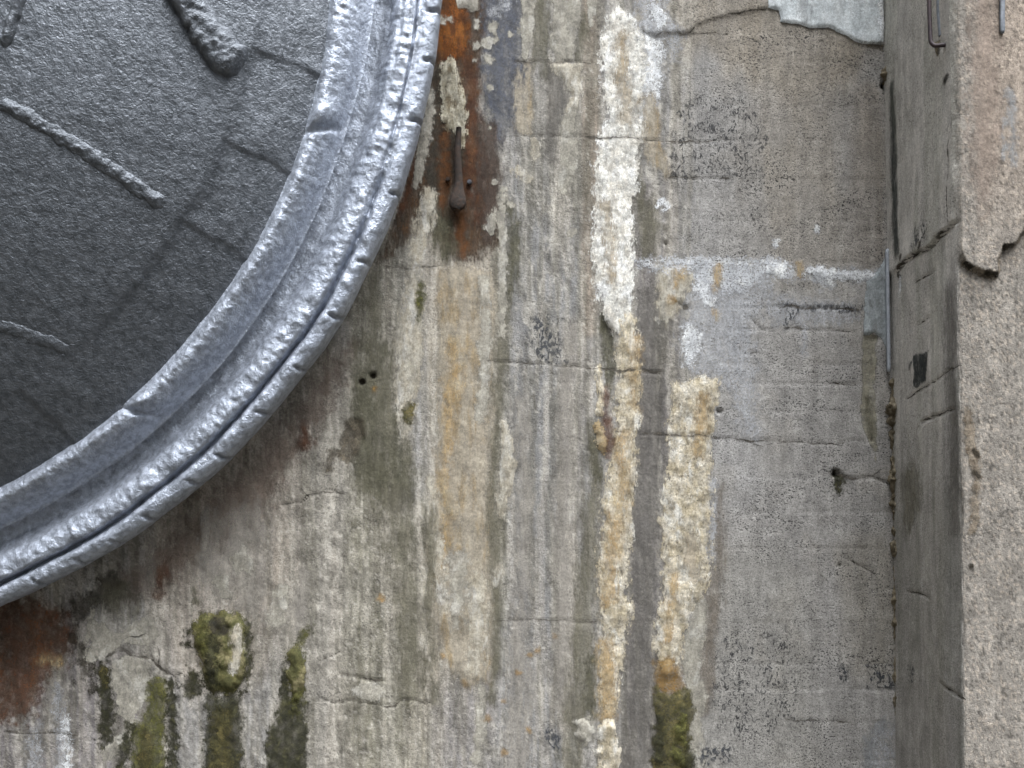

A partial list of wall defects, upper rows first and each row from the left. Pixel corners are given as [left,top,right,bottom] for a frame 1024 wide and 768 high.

peeling [768,0,884,51]
corrosion [380,0,499,263]
leakage [349,0,878,768]
crack [835,469,887,491]
corrosion [0,589,77,728]
leakage [68,571,159,762]